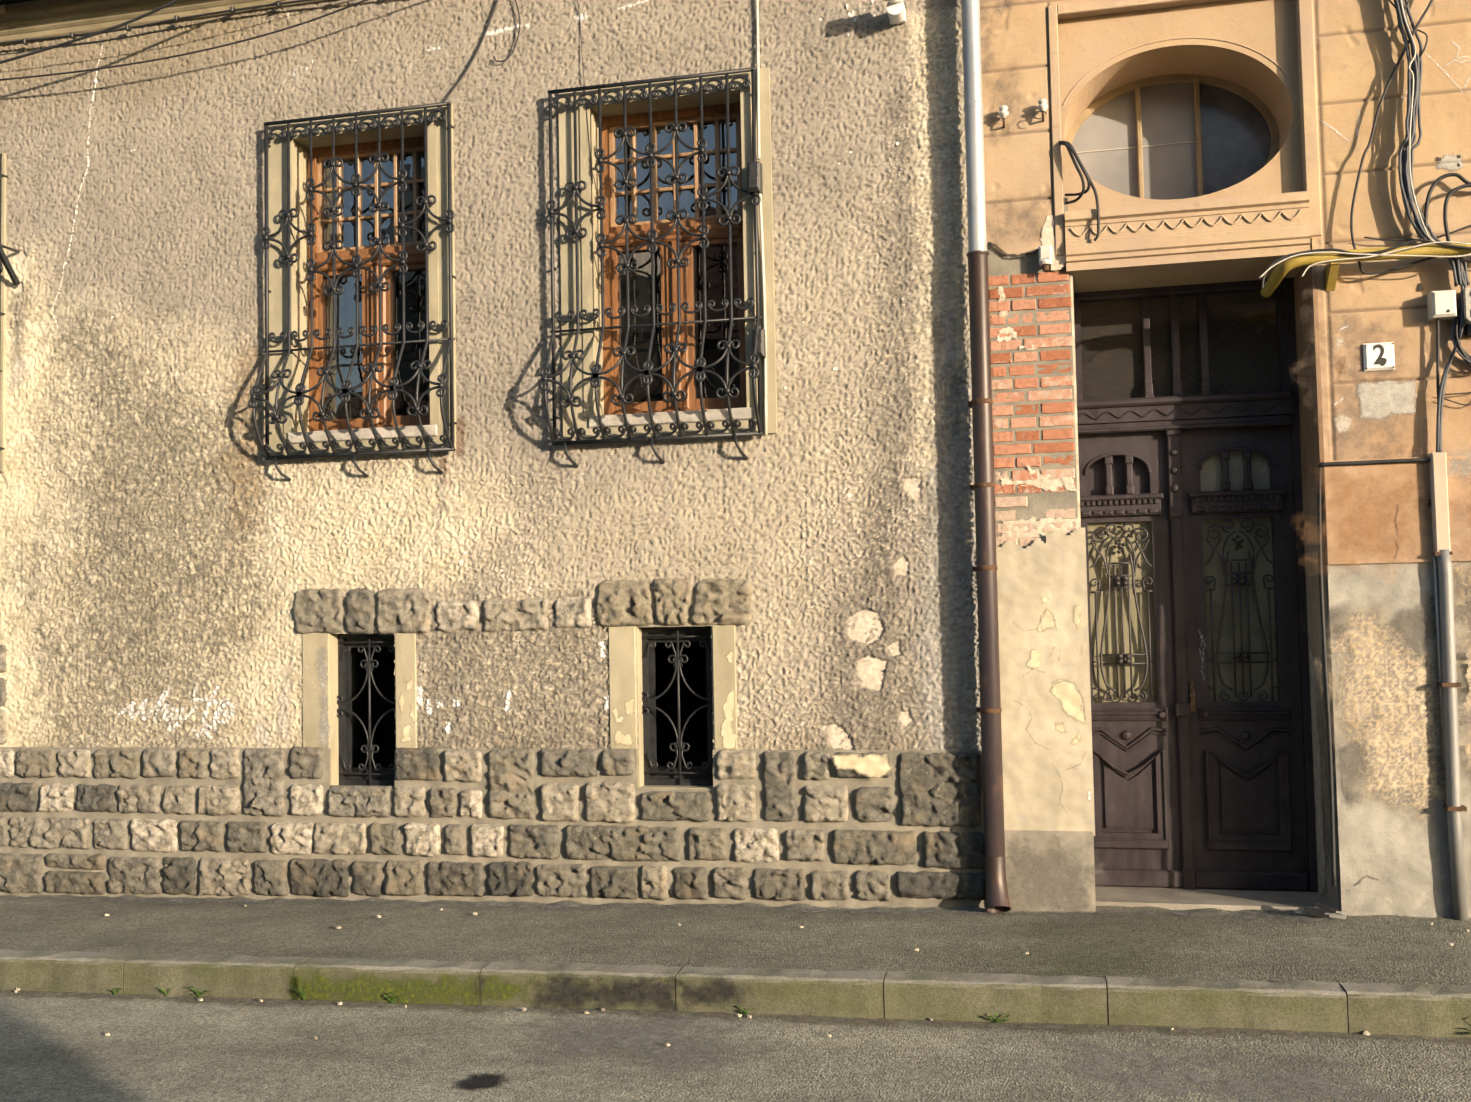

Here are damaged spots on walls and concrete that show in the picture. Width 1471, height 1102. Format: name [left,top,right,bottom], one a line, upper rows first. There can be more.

crack [51,45,125,333]
flaking render [988,215,1081,547]
peeling [721,690,738,749]
peeling [824,724,854,750]
peeling [846,609,902,692]
peeling [1050,681,1087,745]
peeling [1333,611,1446,818]
peeling [1452,564,1471,773]